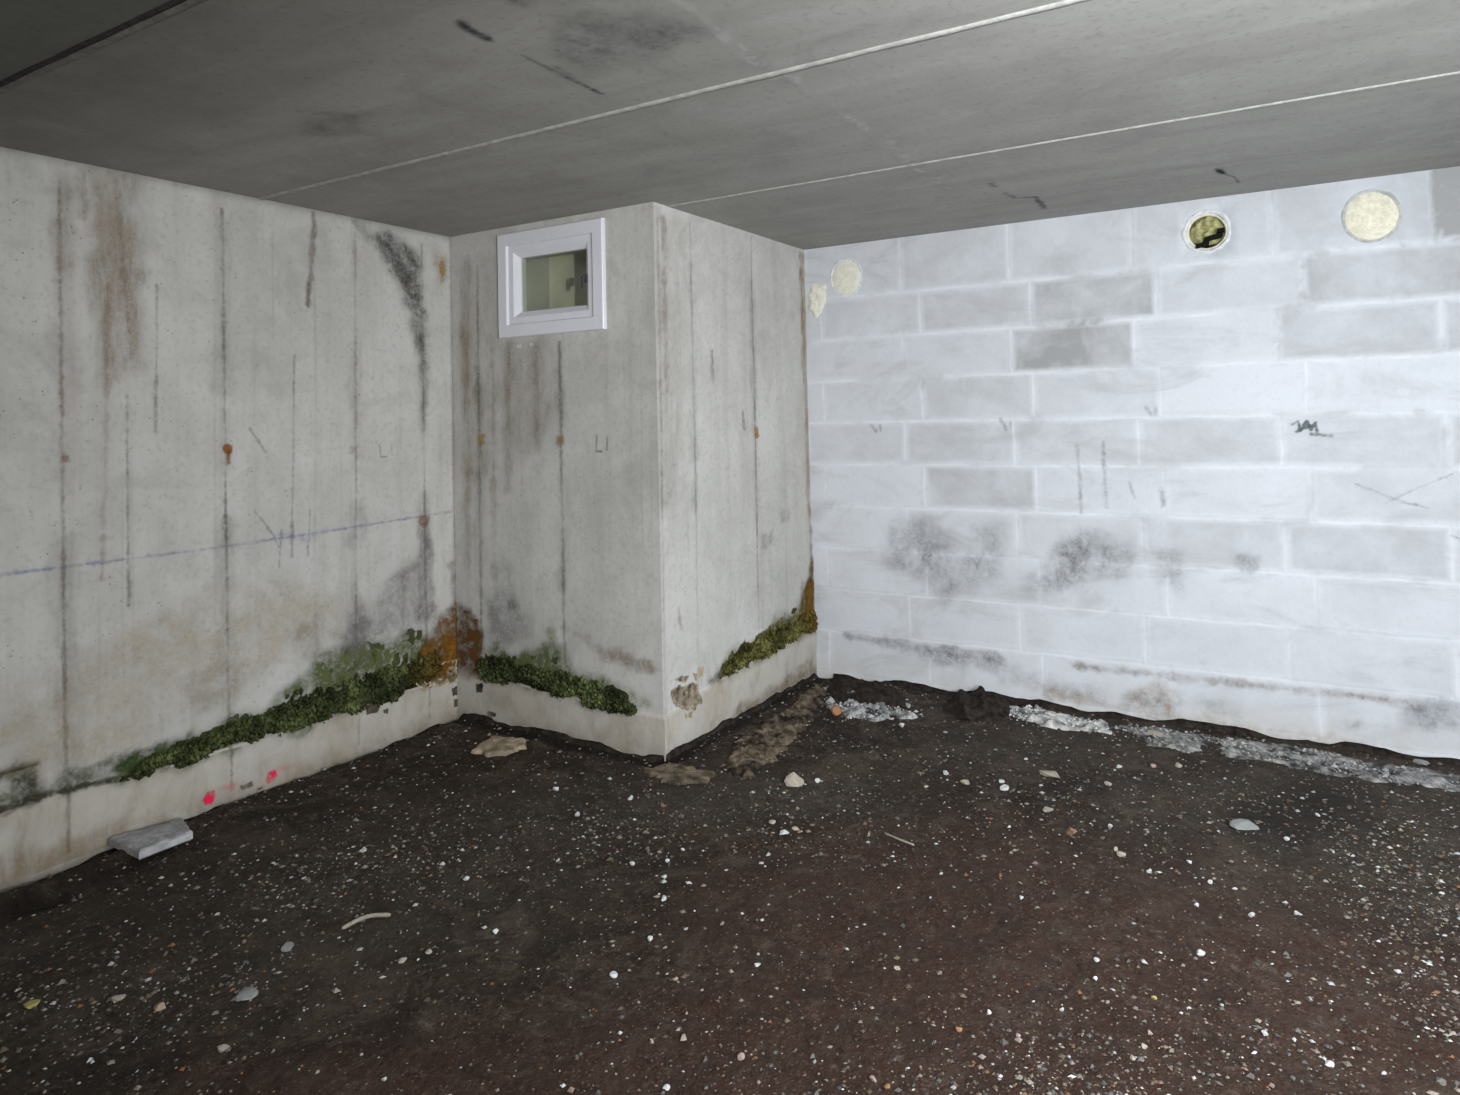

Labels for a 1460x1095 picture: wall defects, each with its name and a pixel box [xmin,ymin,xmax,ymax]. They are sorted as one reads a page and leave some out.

damp [377,234,424,313]
corrosion [421,607,484,681]